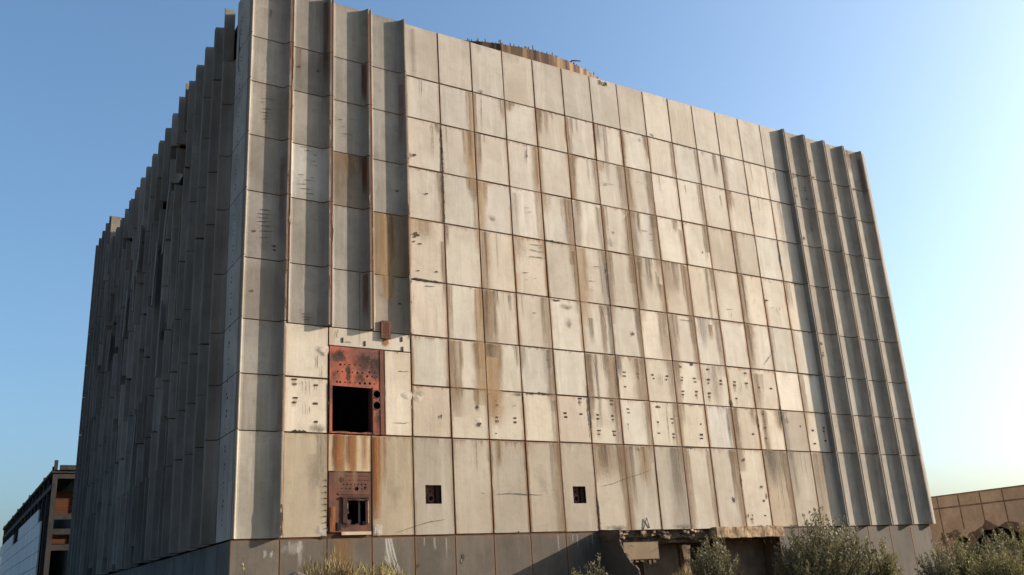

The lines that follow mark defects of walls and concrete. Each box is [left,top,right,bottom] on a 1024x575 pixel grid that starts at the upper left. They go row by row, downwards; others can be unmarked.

corrosion [361,15,392,327]
corrosion [334,435,356,472]
spalling [940,520,1023,562]